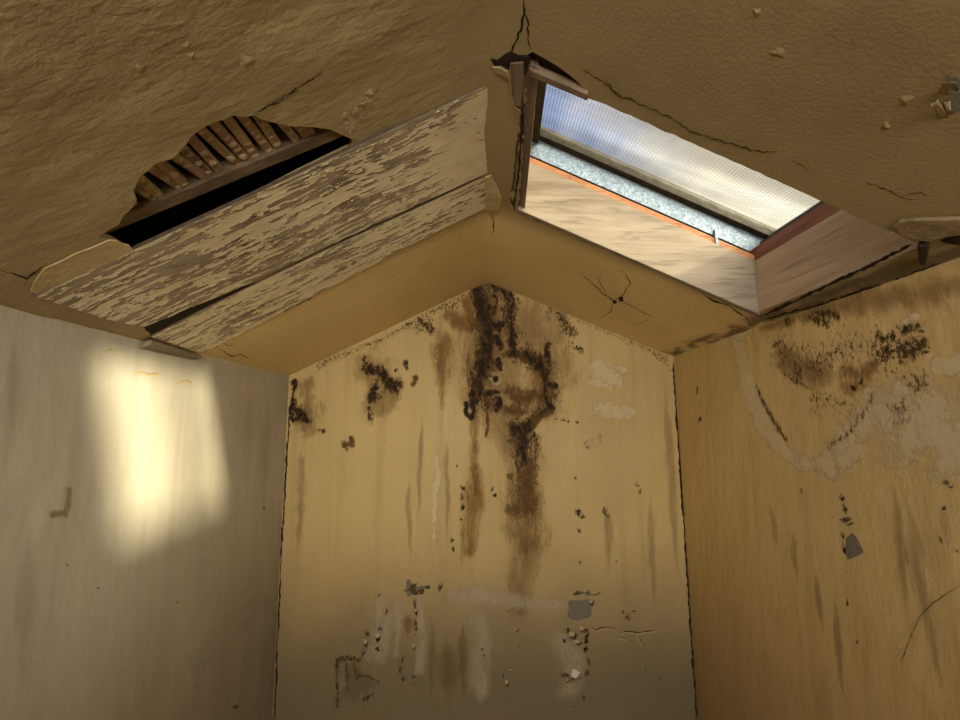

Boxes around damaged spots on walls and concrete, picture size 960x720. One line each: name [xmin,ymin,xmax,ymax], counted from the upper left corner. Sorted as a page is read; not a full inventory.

crack [511,1,531,52]
crack [583,70,808,171]
peeling [930,75,960,119]
peeling [38,87,488,352]
crack [581,264,654,326]
water stain [535,302,671,372]
water stain [288,378,326,433]
water stain [316,284,561,555]
water stain [771,308,960,480]
peeling [839,494,864,560]
peeling [561,588,601,708]
crack [901,585,960,661]